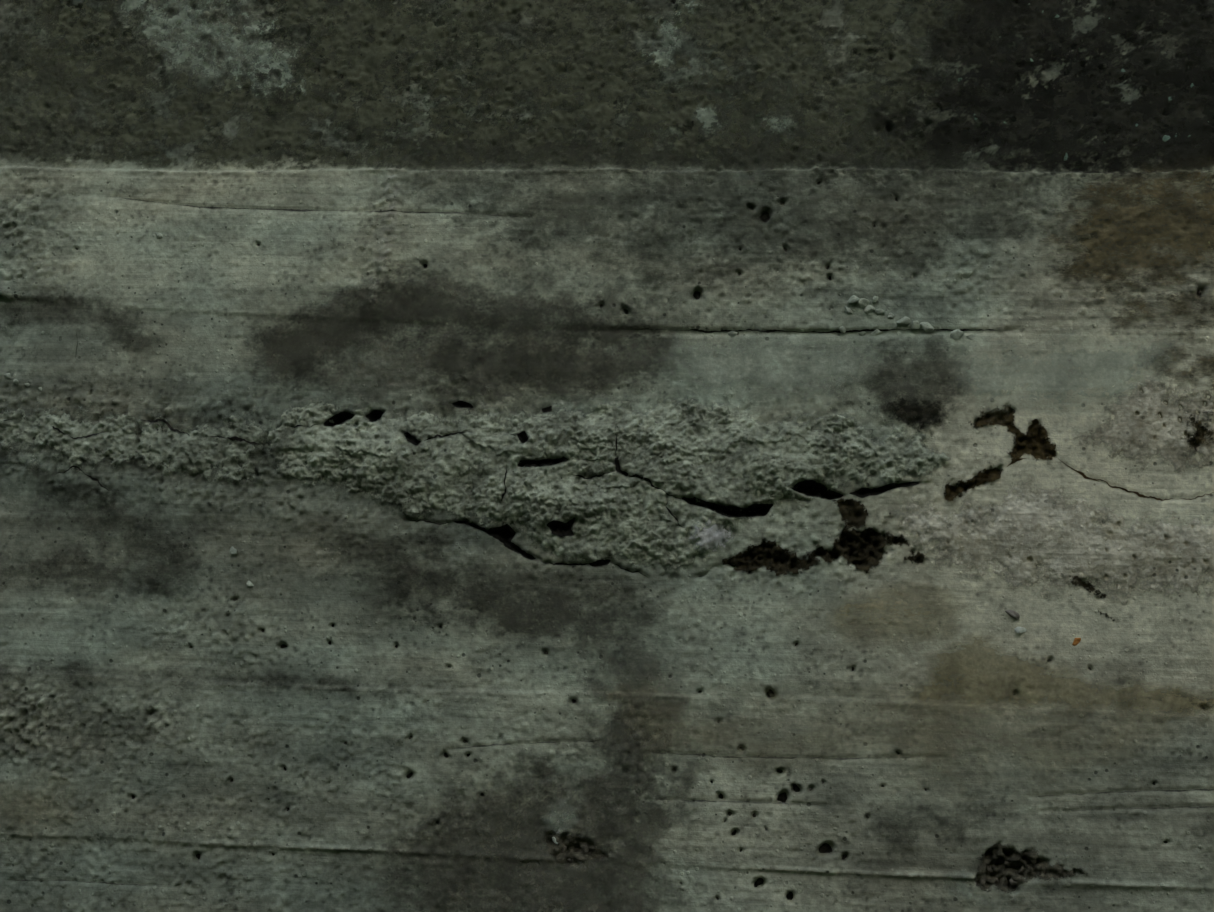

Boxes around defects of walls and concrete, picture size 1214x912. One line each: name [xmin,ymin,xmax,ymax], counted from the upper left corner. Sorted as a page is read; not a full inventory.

water stain [255,267,1161,411]
water stain [1110,291,1214,335]
crack [3,418,112,492]
crack [139,418,320,445]
crack [424,416,517,504]
crack [571,426,688,533]
spalling [681,497,773,518]
spalling [722,480,925,576]
spalling [944,404,1056,502]
crack [1056,457,1214,501]
spalling [1187,417,1212,452]
crack [543,562,648,578]